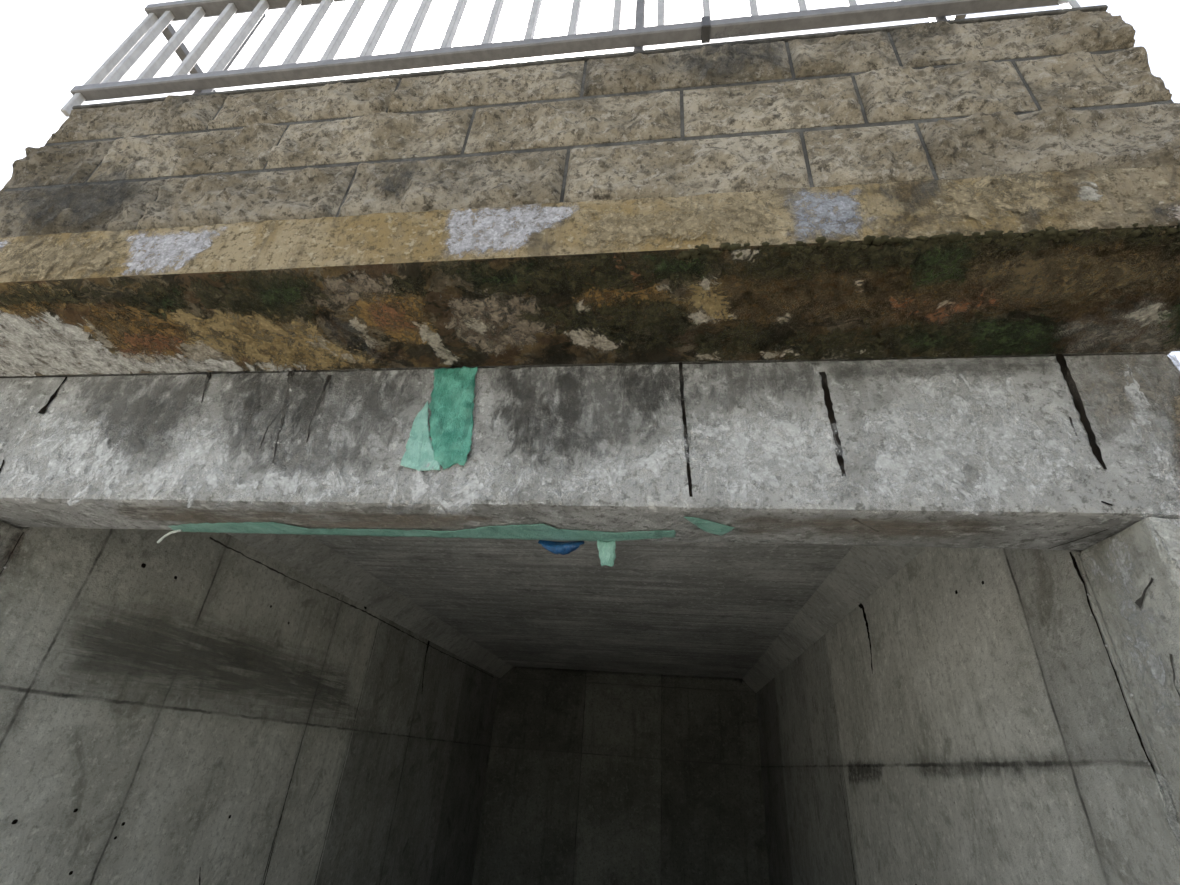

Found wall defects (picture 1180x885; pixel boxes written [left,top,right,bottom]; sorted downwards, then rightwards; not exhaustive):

peeling [0,309,307,376]
peeling [251,270,396,364]
leakage [9,368,417,504]
leakage [411,465,526,506]
leakage [490,362,685,494]
crack [679,362,693,497]
crack [819,372,846,476]
crack [1055,354,1107,469]
crack [0,532,28,574]
leakage [85,617,348,706]
crack [1049,501,1162,787]
crack [1169,654,1180,706]